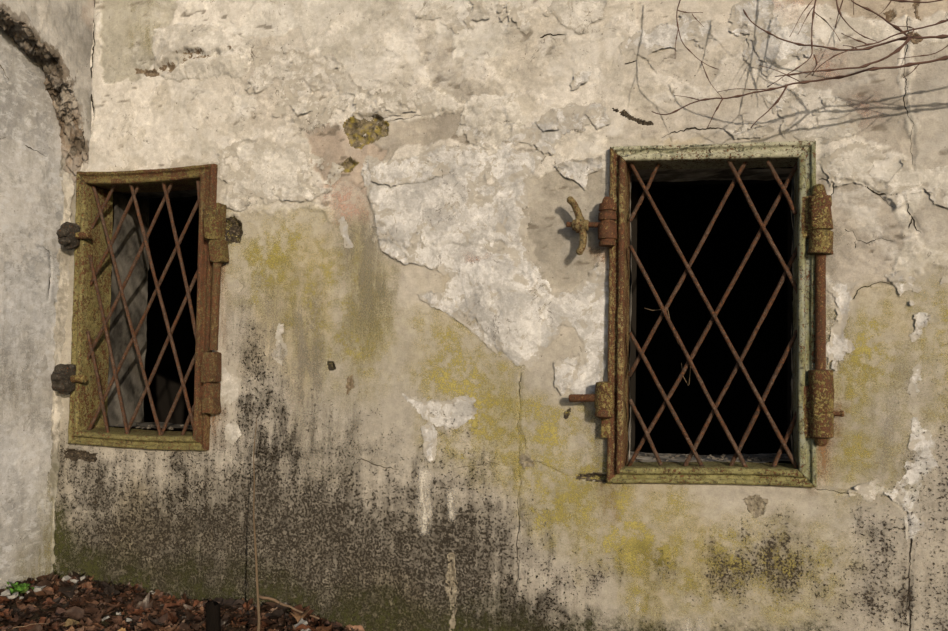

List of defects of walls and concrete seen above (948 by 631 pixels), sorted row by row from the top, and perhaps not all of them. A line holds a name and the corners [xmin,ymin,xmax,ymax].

flaking render [135,48,215,77]
peeling [416,0,533,34]
peeling [542,0,607,34]
crack [900,17,914,165]
peeling [217,47,654,419]
damp [52,295,683,631]
peeling [402,393,478,463]
crack [459,373,576,605]
damp [685,426,948,631]
peeling [848,417,939,541]
crack [905,511,913,631]